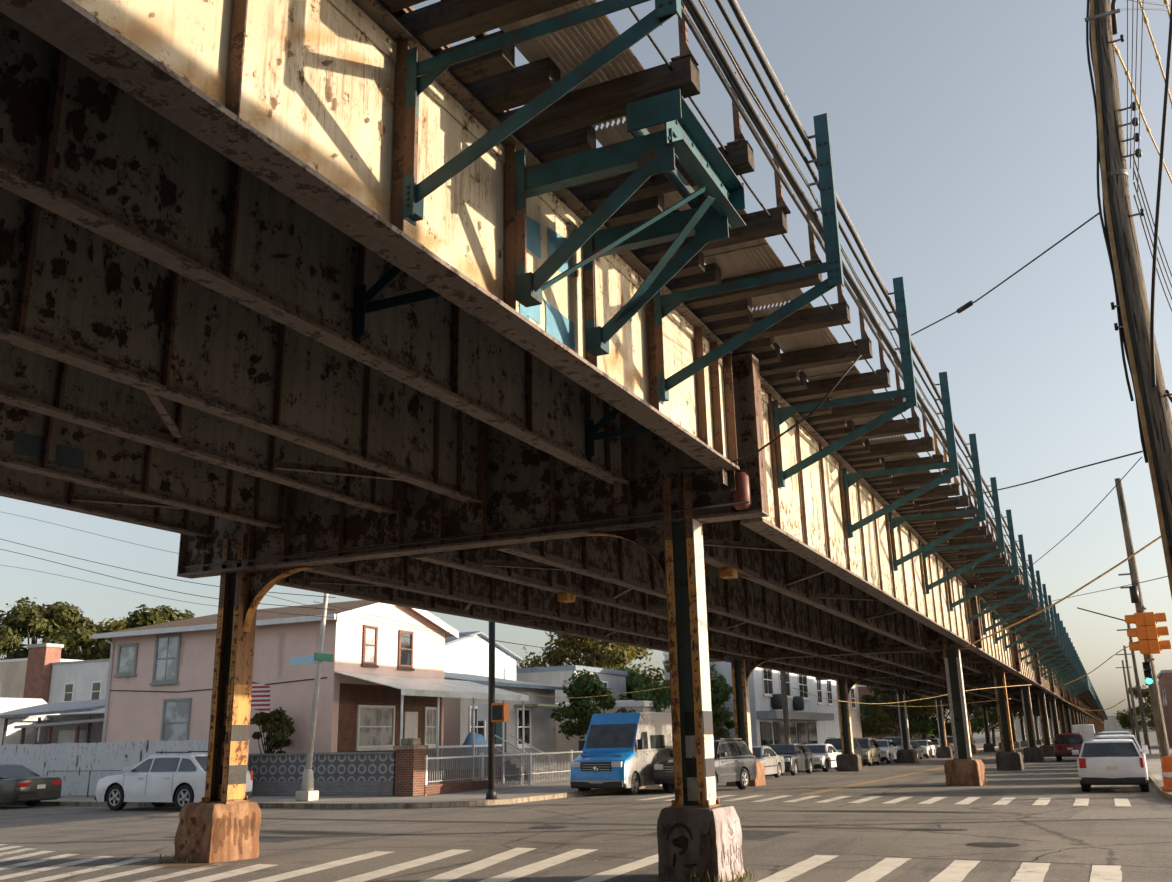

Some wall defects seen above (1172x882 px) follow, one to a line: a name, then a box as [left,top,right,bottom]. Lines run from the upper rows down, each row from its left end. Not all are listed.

peeling [278,36,311,67]
peeling [321,60,339,110]
peeling [65,130,142,218]
peeling [45,234,109,310]
peeling [0,402,30,442]